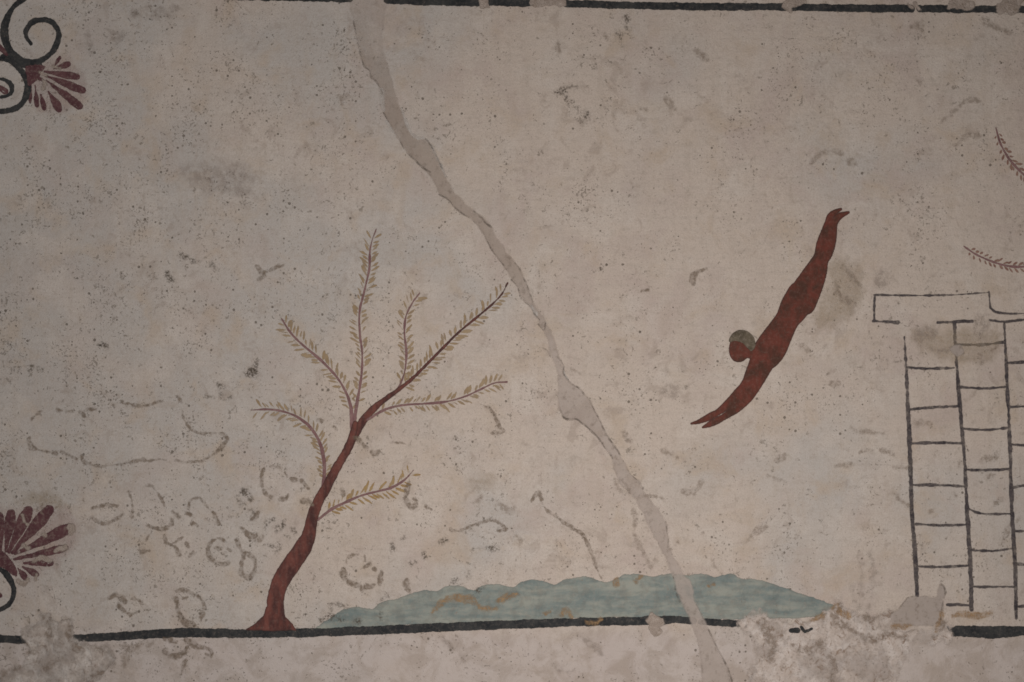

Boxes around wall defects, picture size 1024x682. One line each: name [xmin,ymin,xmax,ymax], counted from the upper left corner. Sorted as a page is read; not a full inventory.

crack [380,88,733,682]
flaking render [736,603,953,682]